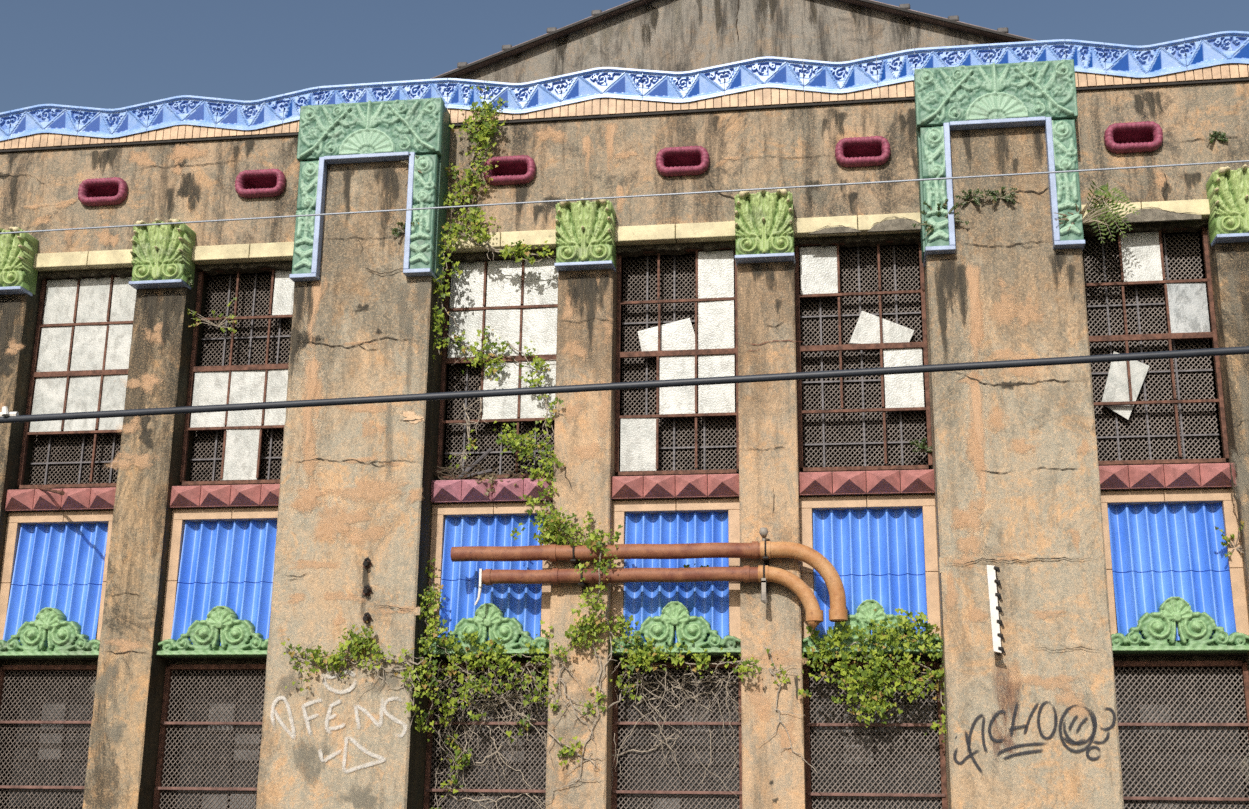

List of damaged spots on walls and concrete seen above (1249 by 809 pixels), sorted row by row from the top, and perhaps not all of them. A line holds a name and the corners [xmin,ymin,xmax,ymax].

damp [642,5,658,43]
damp [698,0,721,28]
damp [757,0,777,31]
damp [557,34,568,60]
crack [299,337,415,350]
crack [955,371,1089,389]
crack [293,457,421,467]